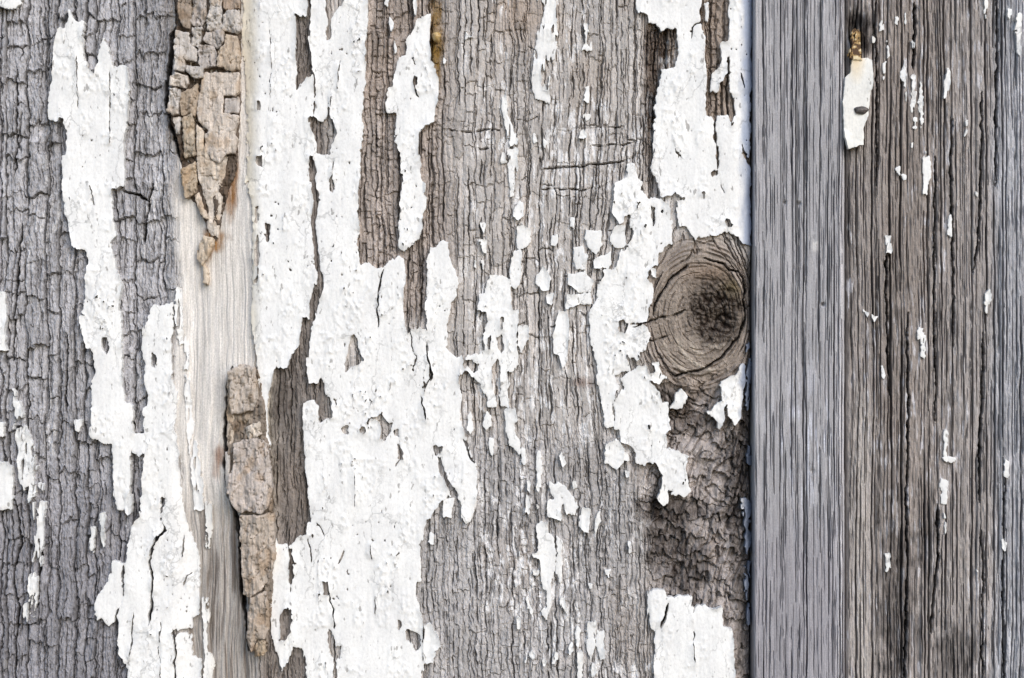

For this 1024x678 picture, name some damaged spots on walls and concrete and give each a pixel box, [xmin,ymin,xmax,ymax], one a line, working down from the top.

peeling [0,0,25,10]
rust [847,28,862,60]
peeling [842,13,907,150]
peeling [900,60,924,129]
peeling [922,151,931,195]
peeling [536,0,752,506]
peeling [0,291,9,351]
peeling [48,9,216,678]
peeling [166,0,605,678]
crack [671,261,746,376]
peeling [0,388,48,622]
peeling [647,588,736,678]